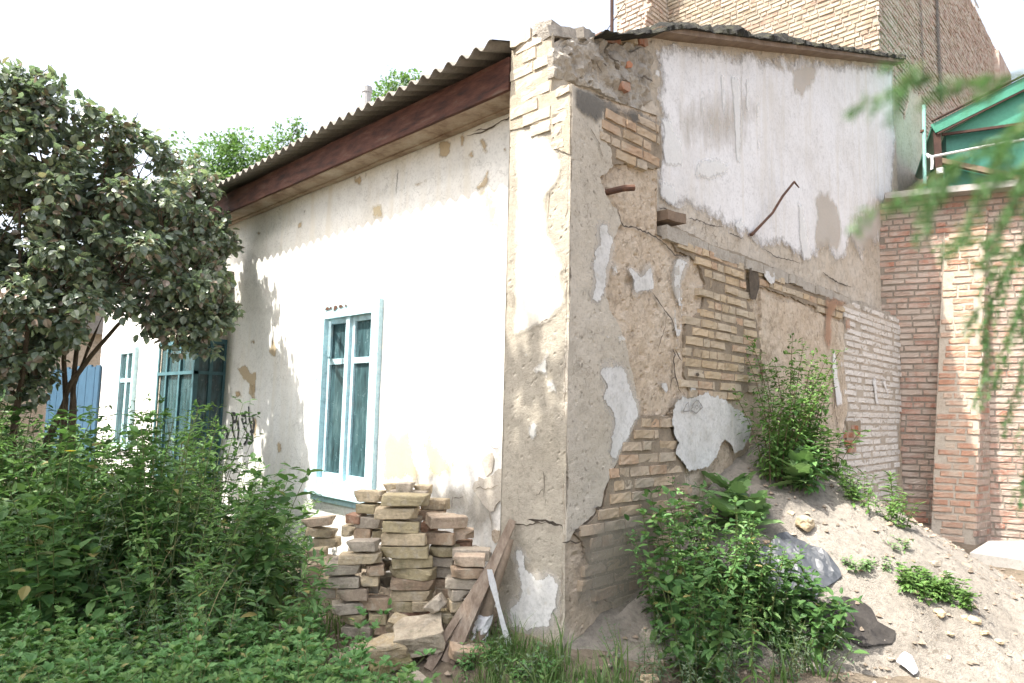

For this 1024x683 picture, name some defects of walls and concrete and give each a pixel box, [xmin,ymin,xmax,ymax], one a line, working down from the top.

spalling [510,35,660,172]
crack [618,212,694,260]
peeling [235,366,256,398]
spalling [676,243,902,502]
crack [452,485,582,544]
spalling [578,418,697,570]